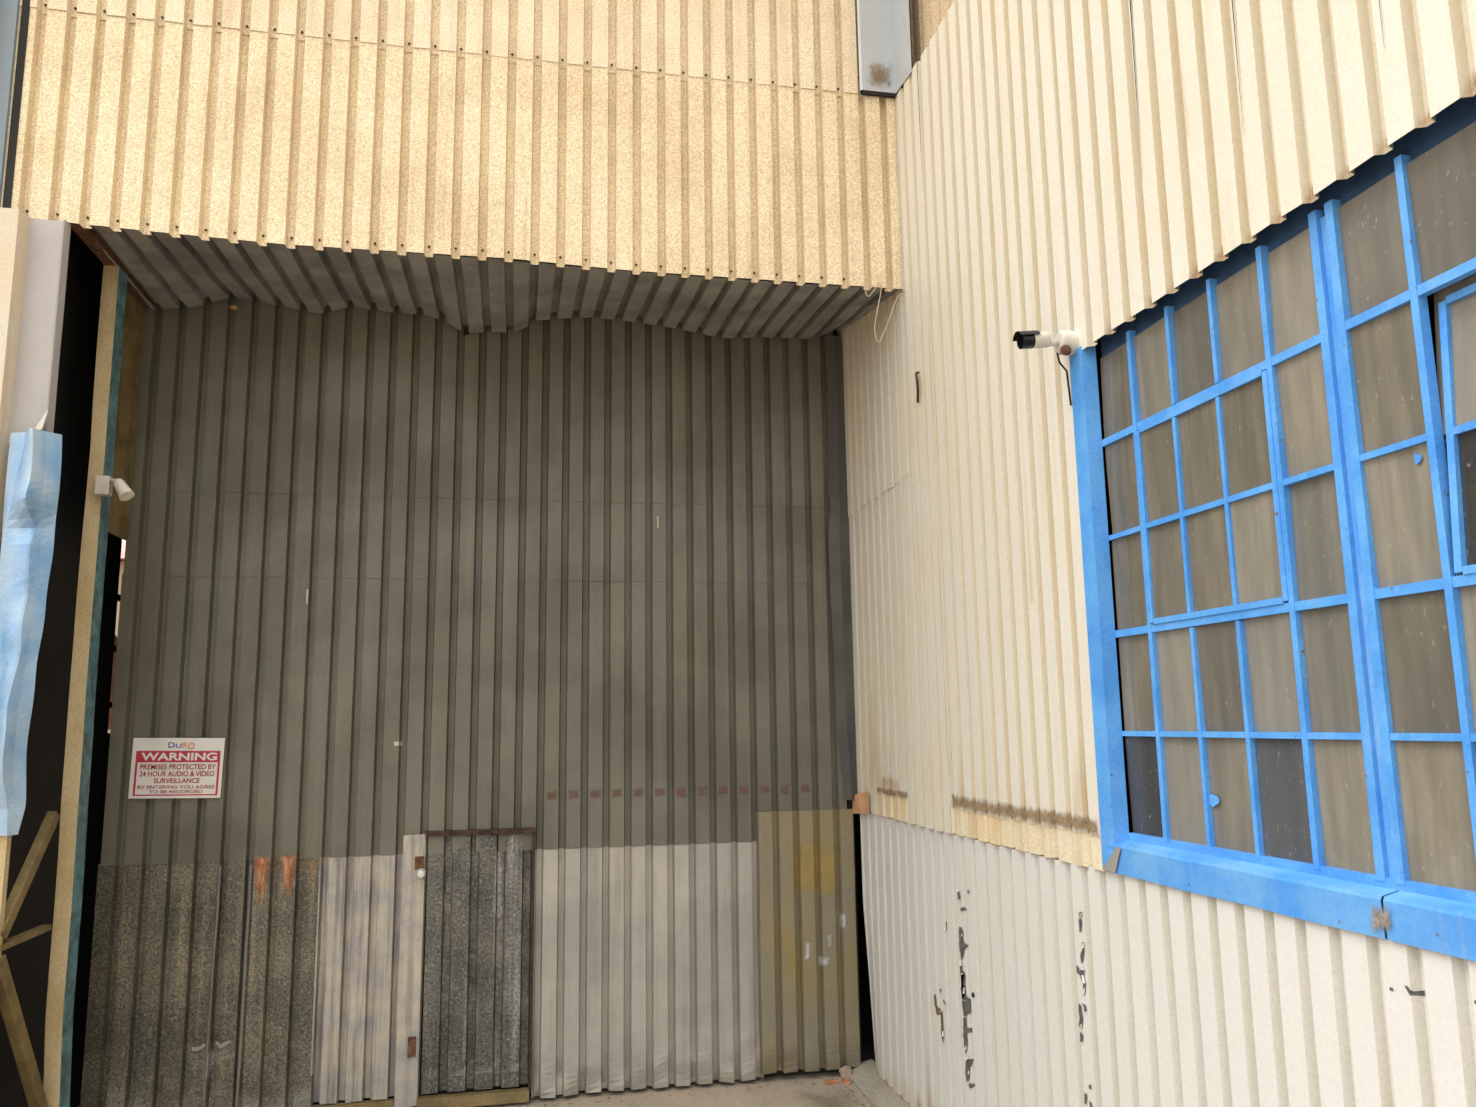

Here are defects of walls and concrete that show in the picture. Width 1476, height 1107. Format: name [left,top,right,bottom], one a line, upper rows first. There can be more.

leakage [877,788,908,798]
leakage [952,796,1097,834]
rust [255,856,294,897]
peeling [933,890,975,1089]
peeling [1076,912,1086,1042]